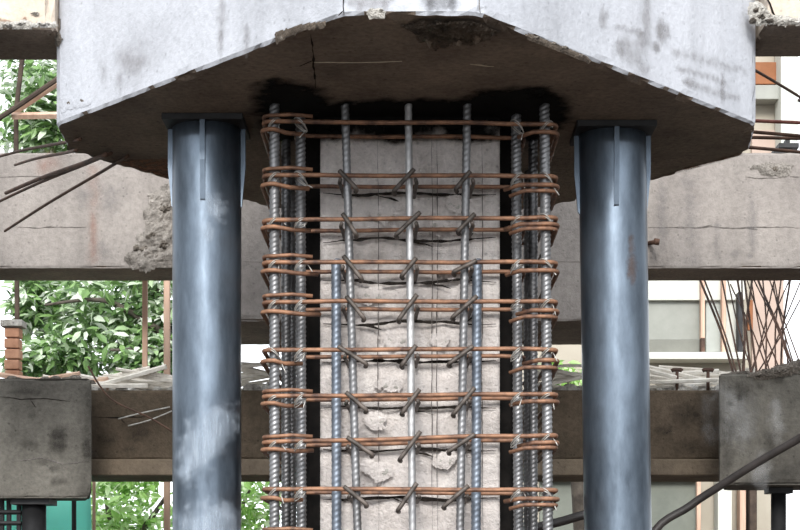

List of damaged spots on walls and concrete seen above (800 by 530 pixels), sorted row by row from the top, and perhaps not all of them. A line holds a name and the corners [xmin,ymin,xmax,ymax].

spalling [748,1,800,27]
spalling [124,184,172,273]
crack [323,276,491,289]
spalling [357,285,385,306]
crack [323,317,491,330]
crack [323,358,496,366]
crack [326,405,489,415]
spalling [364,410,388,430]
crack [323,447,494,457]
spalling [431,451,457,470]
spalling [360,458,393,483]
crack [323,495,485,503]